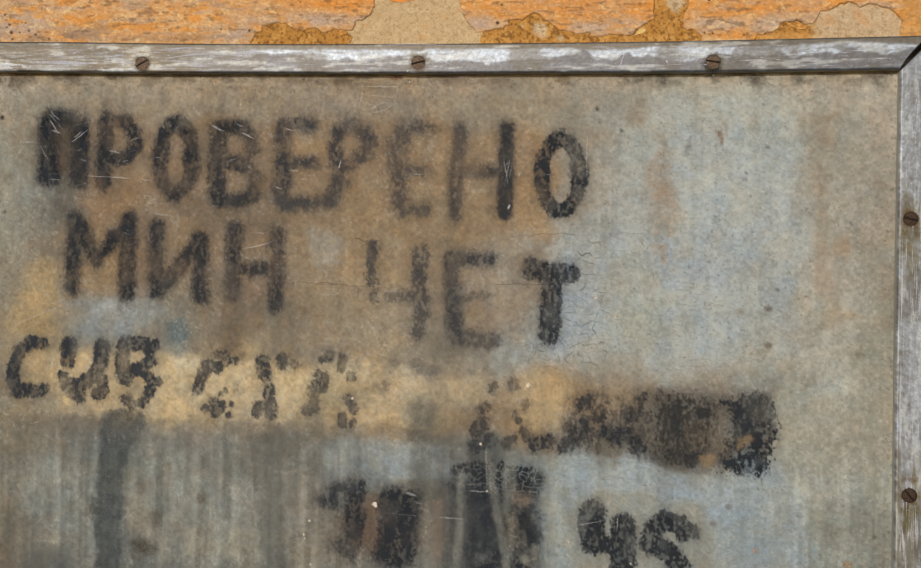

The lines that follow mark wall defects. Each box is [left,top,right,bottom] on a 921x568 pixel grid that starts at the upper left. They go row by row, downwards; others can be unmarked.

flaking render [251,0,701,44]
flaking render [755,2,902,40]